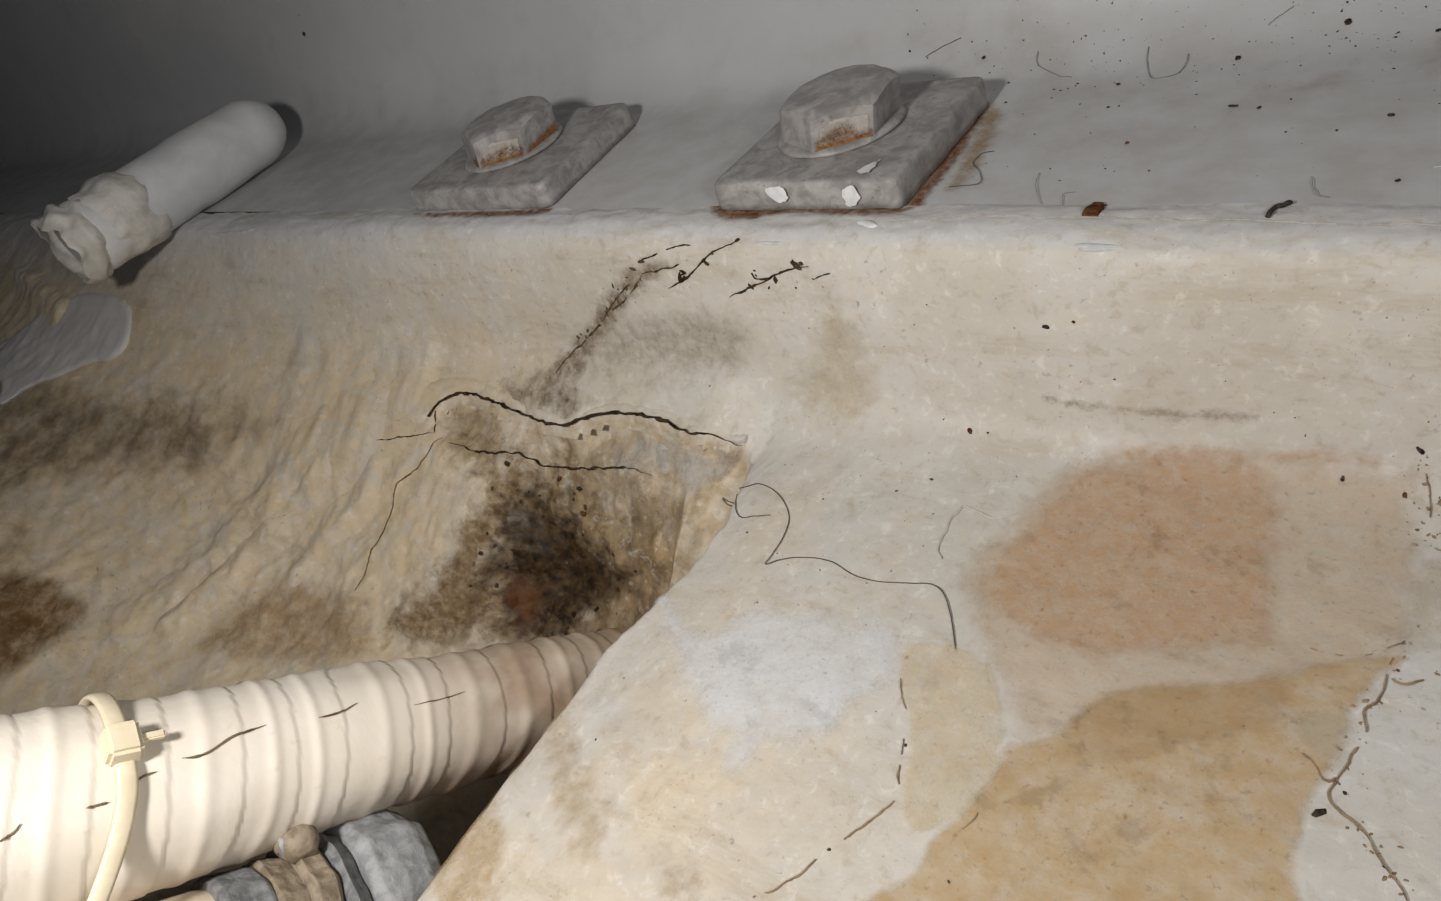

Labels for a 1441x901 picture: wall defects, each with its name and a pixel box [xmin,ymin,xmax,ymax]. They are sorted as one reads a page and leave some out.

corrosion [474,121,557,168]
corrosion [713,111,998,219]
crack [549,238,829,379]
water stain [0,396,208,481]
water stain [874,457,1411,901]